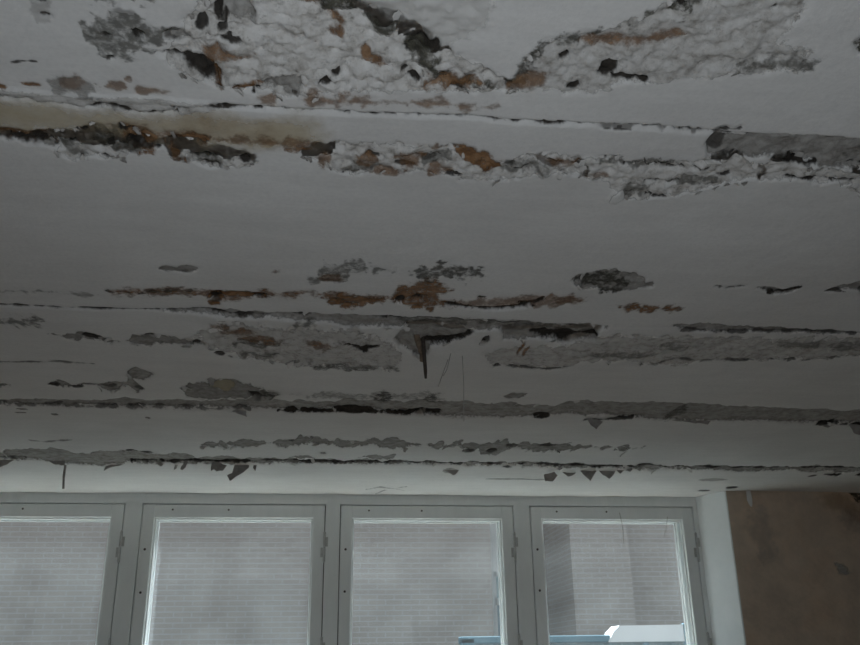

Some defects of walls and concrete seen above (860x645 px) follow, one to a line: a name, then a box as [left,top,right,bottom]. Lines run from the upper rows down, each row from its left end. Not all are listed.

flaking render [166,0,519,103]
water stain [0,104,310,147]
rust [105,278,454,312]
flaking render [572,268,654,294]
peeling [760,286,802,294]
peeling [826,281,860,292]
flaking render [51,312,473,371]
flaking render [487,322,860,369]
peeling [49,380,86,388]
peeling [98,367,152,394]
flaking render [180,377,274,401]
peeling [200,434,640,472]